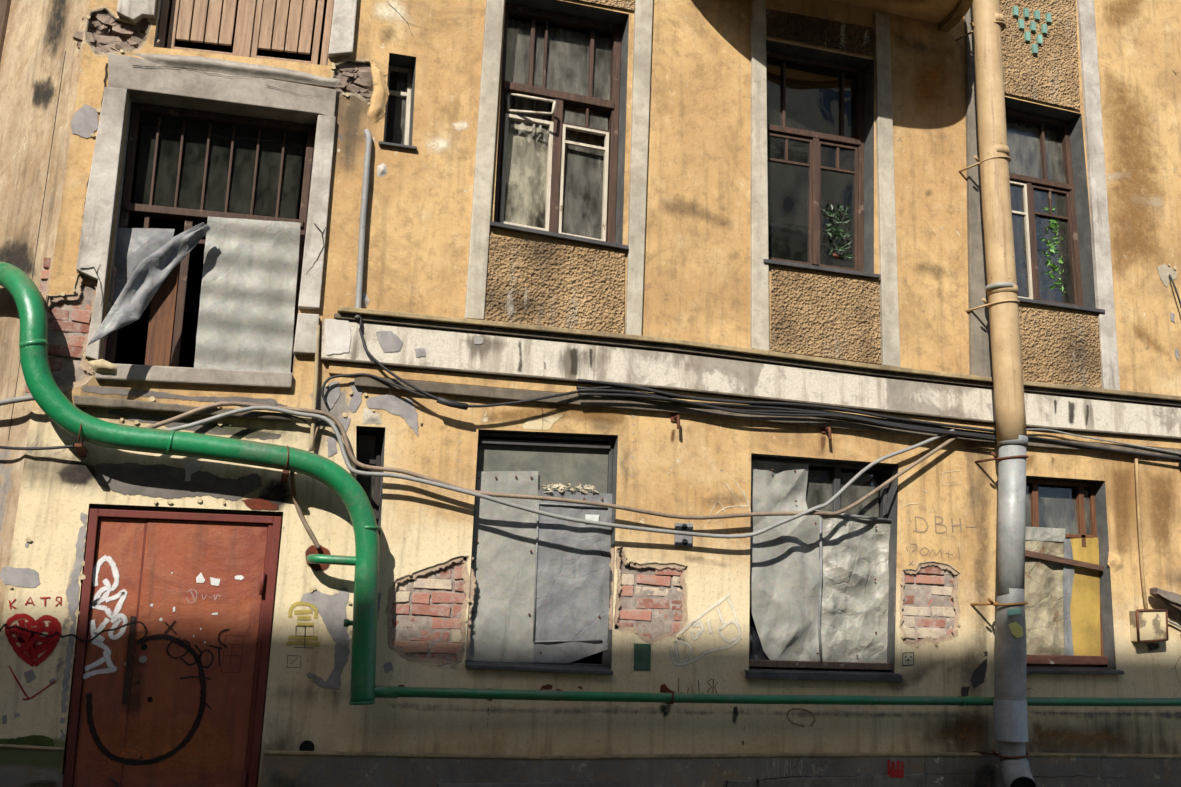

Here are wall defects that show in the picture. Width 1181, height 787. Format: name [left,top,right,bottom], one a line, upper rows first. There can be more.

flaking render [73,7,161,54]
flaking render [327,59,375,105]
flaking render [39,257,116,392]
flaking render [377,556,476,673]
flaking render [608,544,688,645]
flaking render [894,561,960,647]